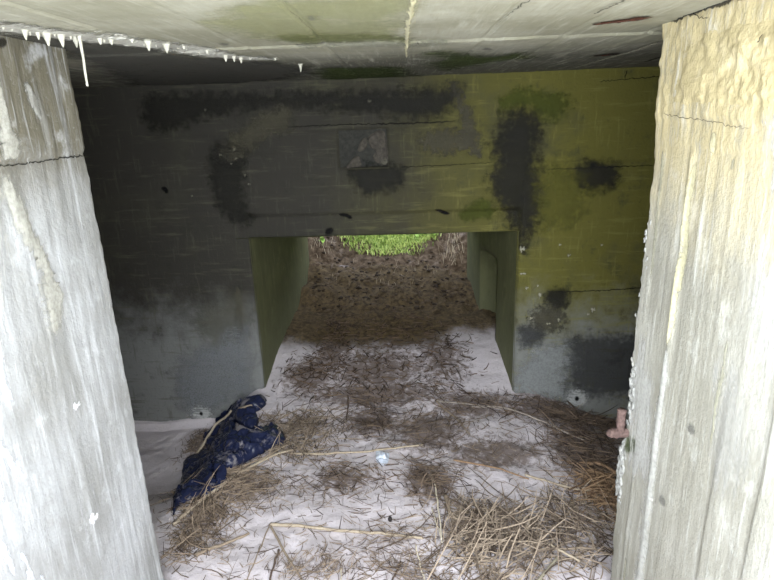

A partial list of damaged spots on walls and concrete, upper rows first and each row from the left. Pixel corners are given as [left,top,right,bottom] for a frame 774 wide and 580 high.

damp [0,32,311,86]
crack [601,56,661,82]
damp [0,82,22,160]
crack [664,113,744,129]
crack [0,154,83,167]
damp [348,162,406,195]
damp [487,107,545,255]
damp [0,177,63,334]
crack [554,285,641,293]
spalling [626,357,637,426]
damp [514,325,667,580]
spalling [615,439,626,505]